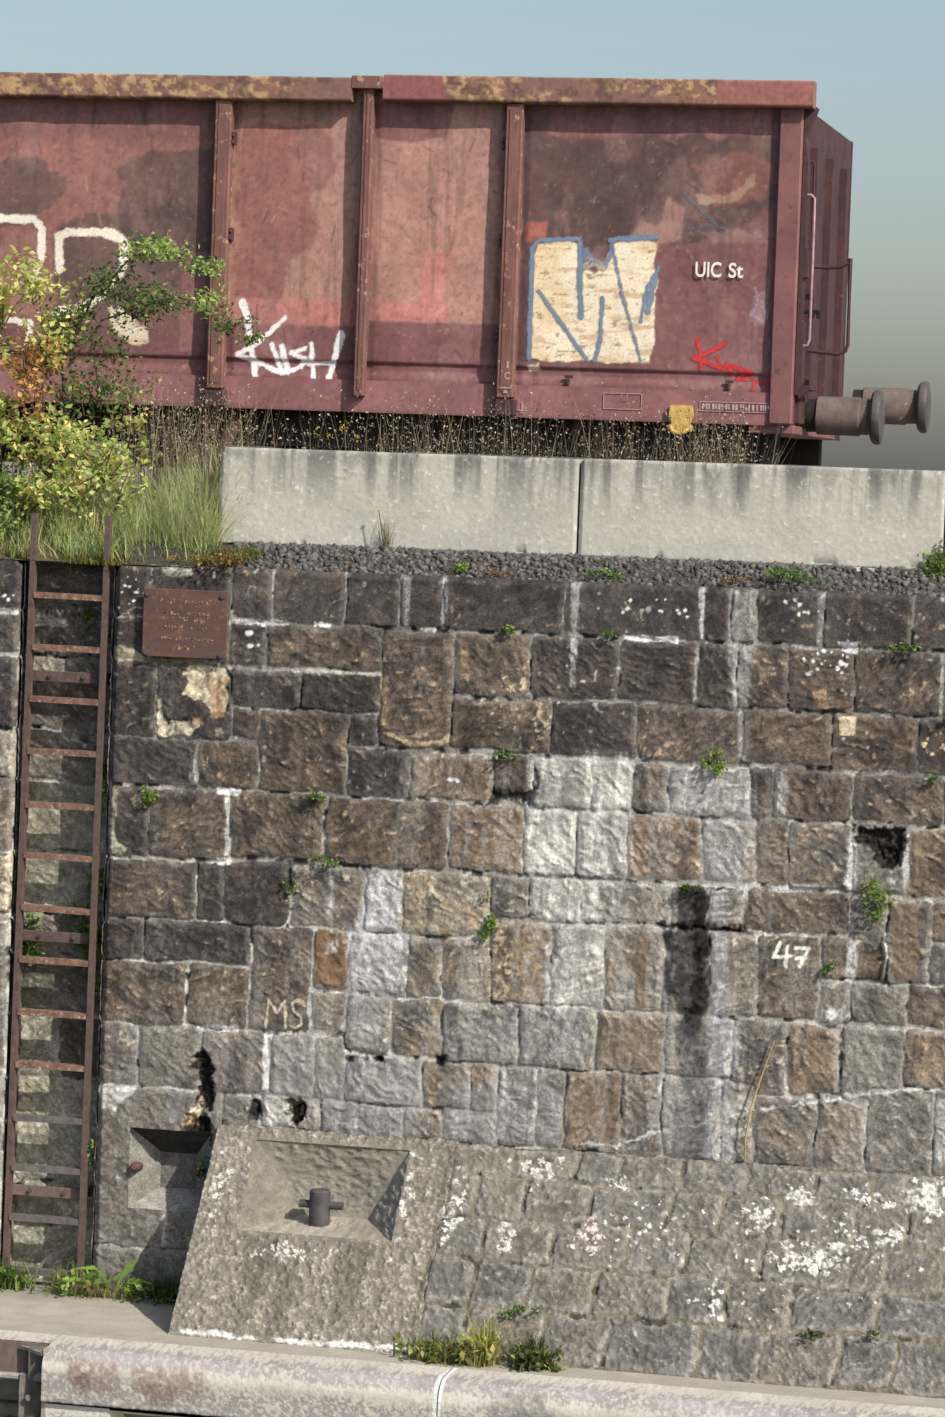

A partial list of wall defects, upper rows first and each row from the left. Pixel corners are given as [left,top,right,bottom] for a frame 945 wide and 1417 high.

peeling [114,646,229,737]
peeling [1,731,16,774]
peeling [0,852,13,911]
leakage [663,587,758,1164]
hole [855,826,906,869]